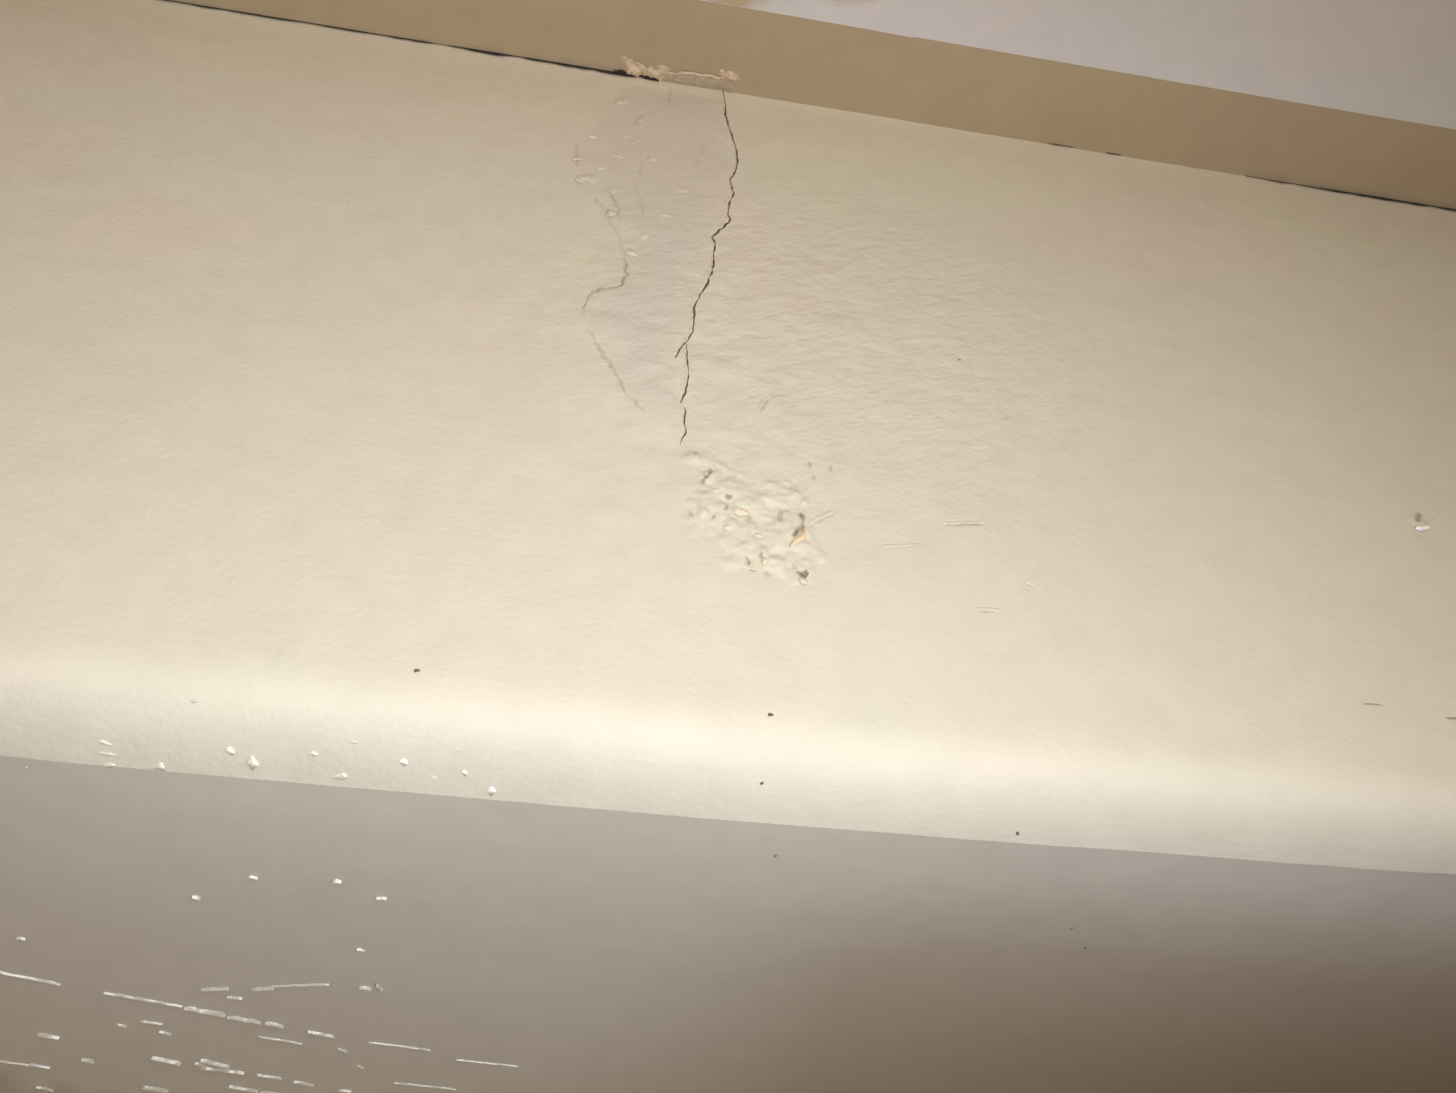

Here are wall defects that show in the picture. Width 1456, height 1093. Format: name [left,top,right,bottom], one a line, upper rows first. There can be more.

crack [673,90,739,444]